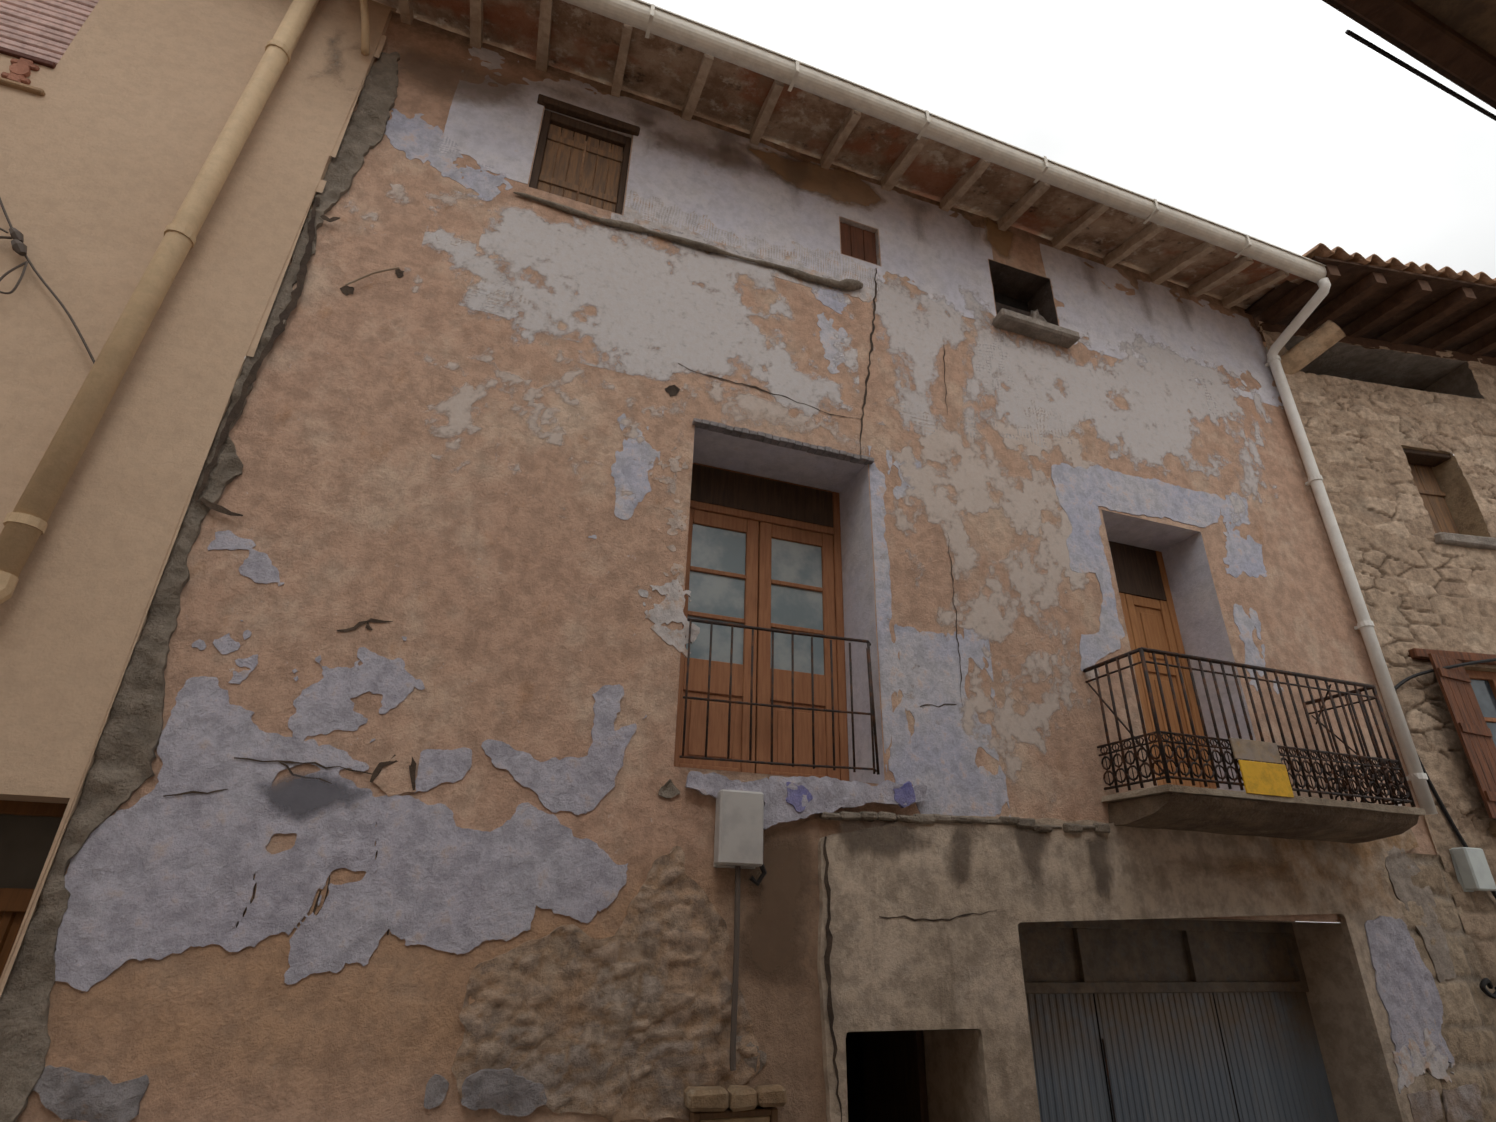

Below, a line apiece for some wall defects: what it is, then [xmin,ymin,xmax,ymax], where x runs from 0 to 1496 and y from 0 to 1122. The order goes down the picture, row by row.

crack [678,268,877,455]
peeling [980,243,1283,671]
peeling [0,47,1089,1122]
peeling [1233,603,1284,695]
crack [163,754,416,797]
crack [236,878,256,928]
crack [313,875,330,914]
crack [823,836,842,1122]
peeling [1364,916,1483,1122]